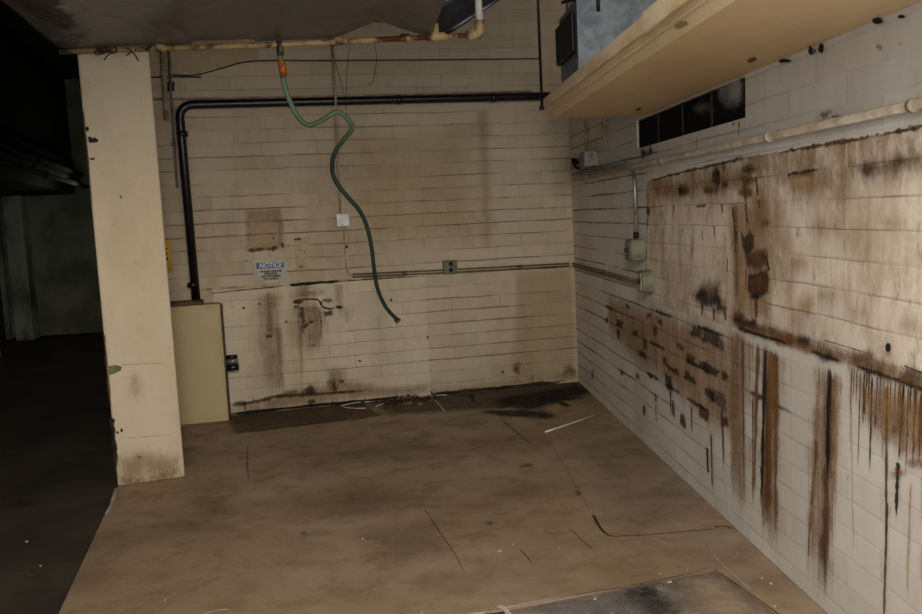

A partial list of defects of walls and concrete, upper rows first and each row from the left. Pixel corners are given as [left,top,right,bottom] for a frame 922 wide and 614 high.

corrosion [727,199,770,317]
peeling [644,125,922,387]
damp [231,367,578,432]
corrosion [731,333,779,532]
corrosion [808,370,838,581]
corrosion [850,369,922,614]